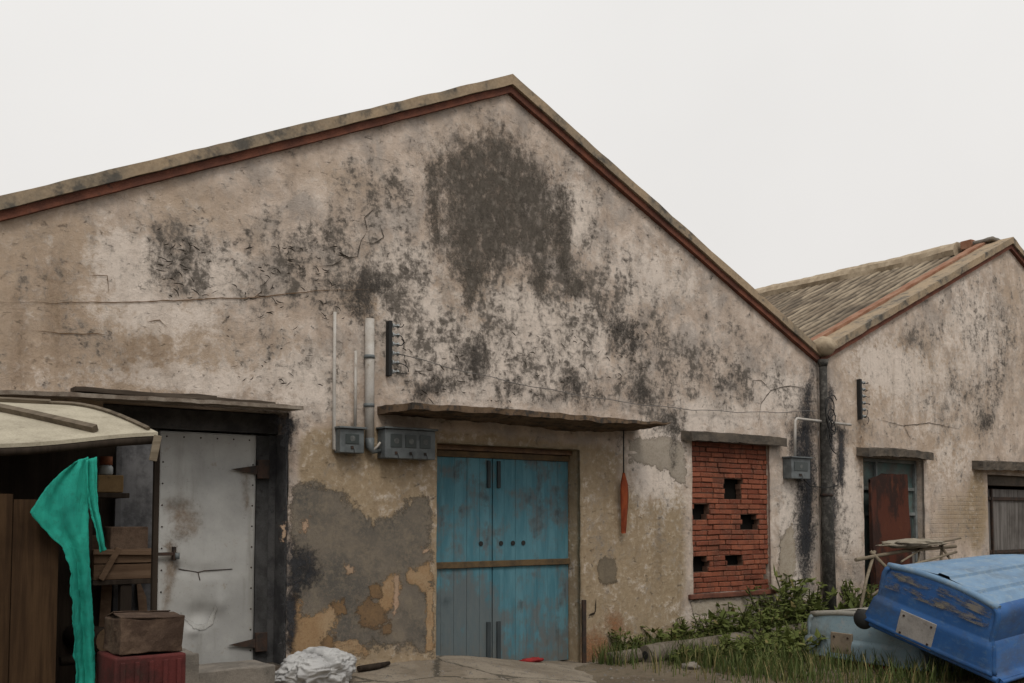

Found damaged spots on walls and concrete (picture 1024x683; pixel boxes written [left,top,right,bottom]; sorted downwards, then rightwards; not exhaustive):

crack [41,210,384,322]
water stain [425,122,586,312]
crack [43,329,104,337]
mould [411,368,445,401]
mould [453,331,490,382]
mould [600,311,639,355]
peeling [279,480,435,659]
peeling [628,436,688,488]
water stain [789,369,818,590]
water stain [828,387,845,548]
rust [868,473,913,591]